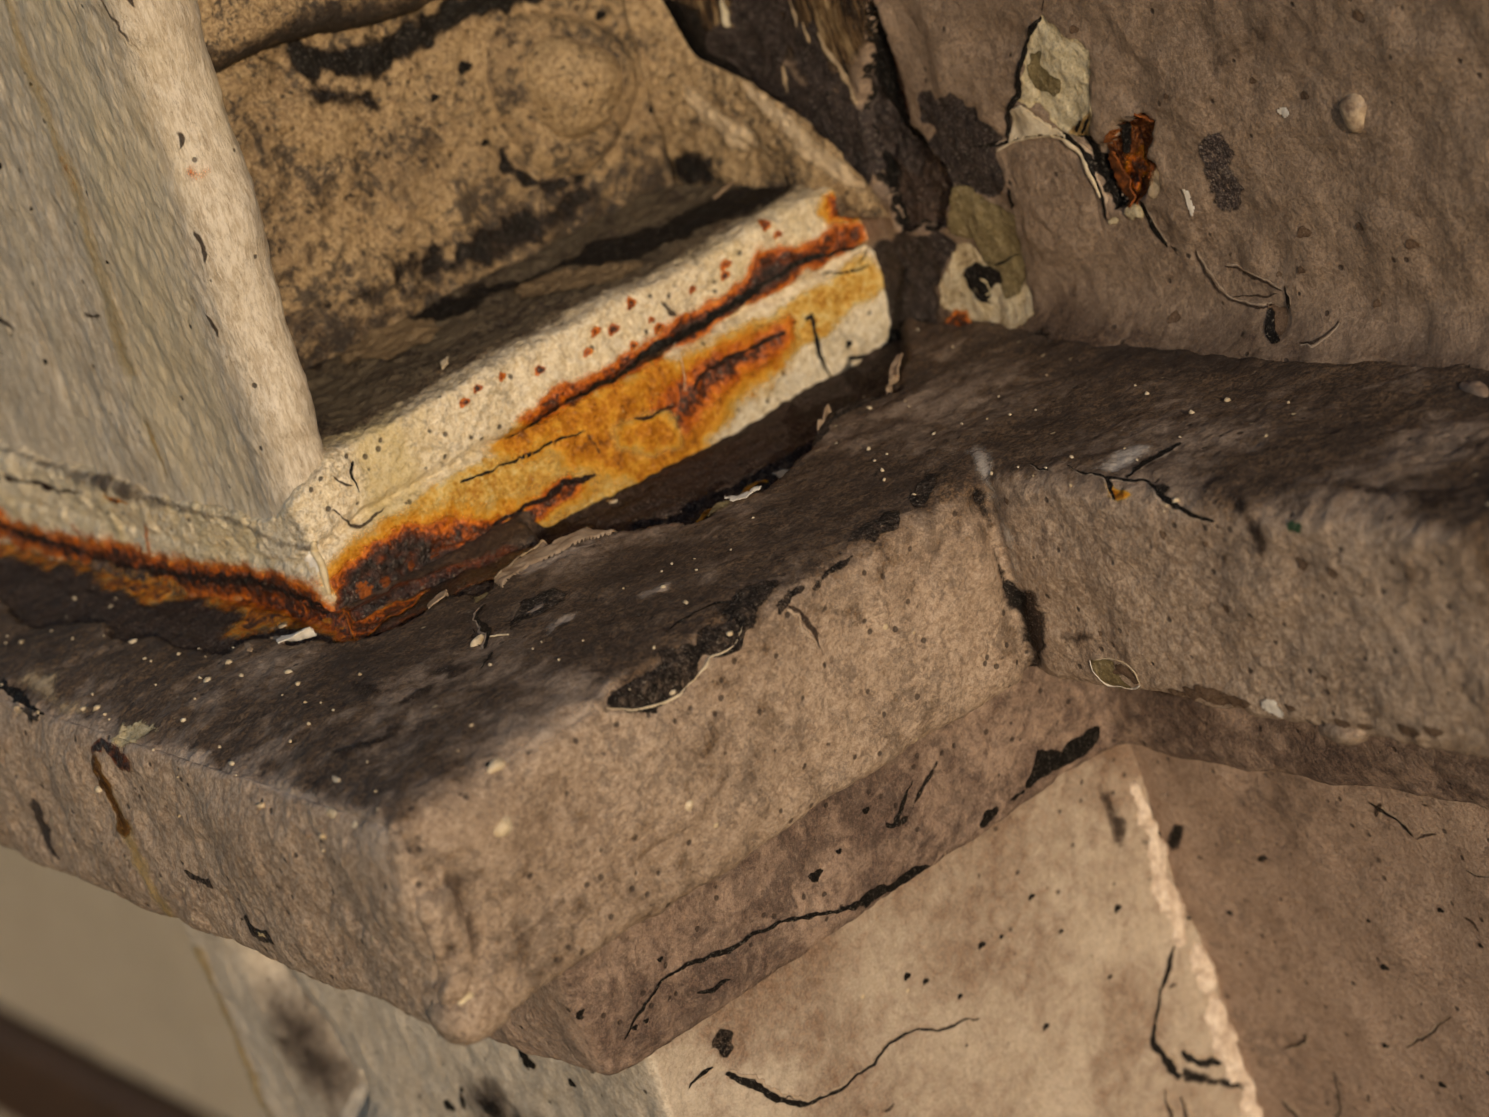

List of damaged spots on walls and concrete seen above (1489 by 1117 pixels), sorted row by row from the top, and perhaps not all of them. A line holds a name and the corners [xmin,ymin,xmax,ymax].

rust [758,220,782,240]
rust [817,191,860,224]
crack [995,131,1339,348]
peeling [334,317,444,364]
peeling [367,0,1092,638]
rust [0,254,884,643]
peeling [505,473,940,763]
leakage [1102,793,1126,843]
leakage [1146,804,1183,851]
crack [689,1017,980,1108]
crack [1150,946,1244,1117]
crack [1406,1016,1451,1049]